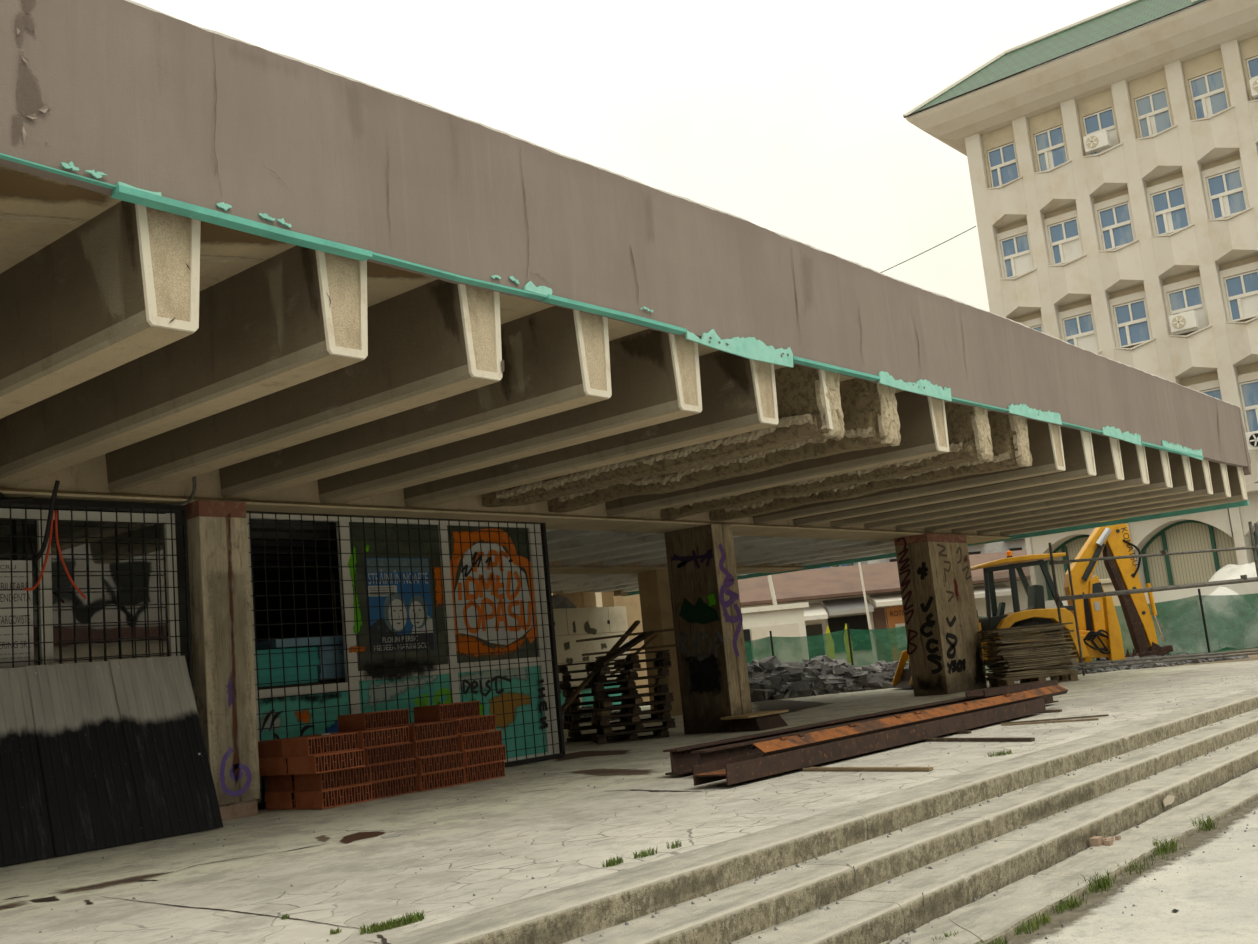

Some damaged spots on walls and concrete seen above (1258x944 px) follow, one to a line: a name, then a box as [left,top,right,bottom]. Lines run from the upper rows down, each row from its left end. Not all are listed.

peeling [12,0,50,143]
crack [213,32,222,198]
peeling [685,329,793,368]
spalling [496,371,952,509]
spalling [672,404,1062,518]
crack [1,830,407,944]